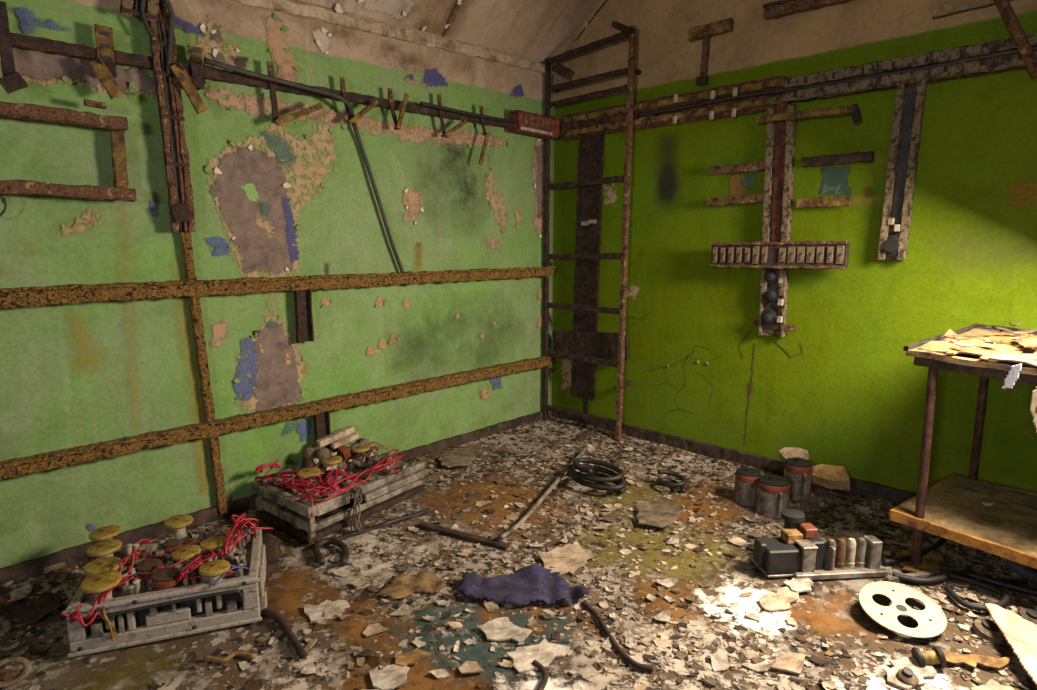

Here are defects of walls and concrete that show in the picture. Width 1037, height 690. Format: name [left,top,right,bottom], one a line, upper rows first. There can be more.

peeling [11,7,69,34]
peeling [0,46,156,98]
peeling [174,13,510,278]
peeling [210,319,228,347]
peeling [233,292,309,411]
peeling [481,376,502,400]
crack [646,331,803,446]
peeling [283,419,311,442]